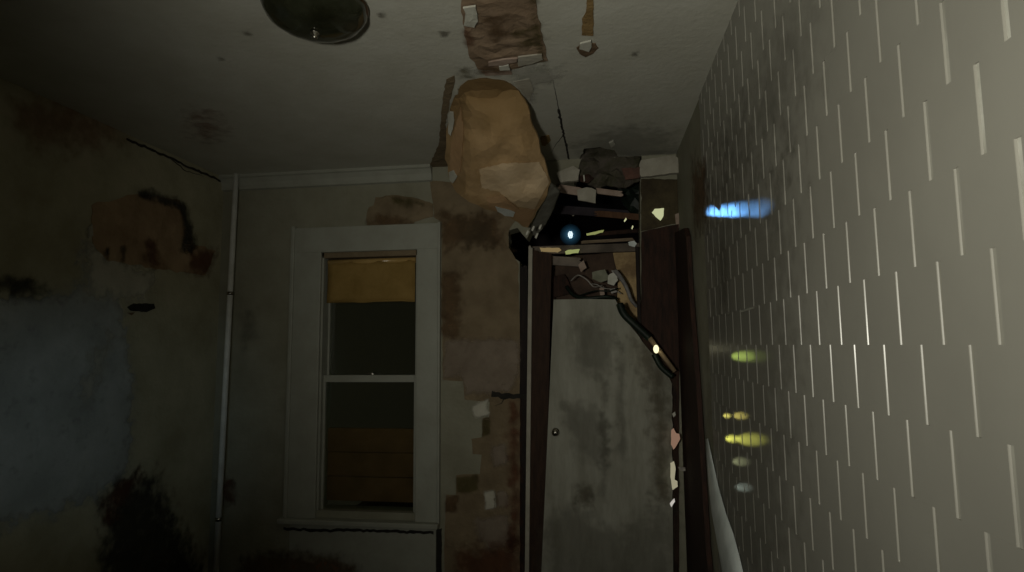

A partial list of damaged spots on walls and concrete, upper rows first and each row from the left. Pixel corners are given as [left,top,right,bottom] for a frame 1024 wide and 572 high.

spalling [461,0,548,73]
peeling [576,0,598,57]
crack [536,80,570,159]
crack [126,138,221,182]
spalling [366,181,520,572]
damp [99,468,203,572]